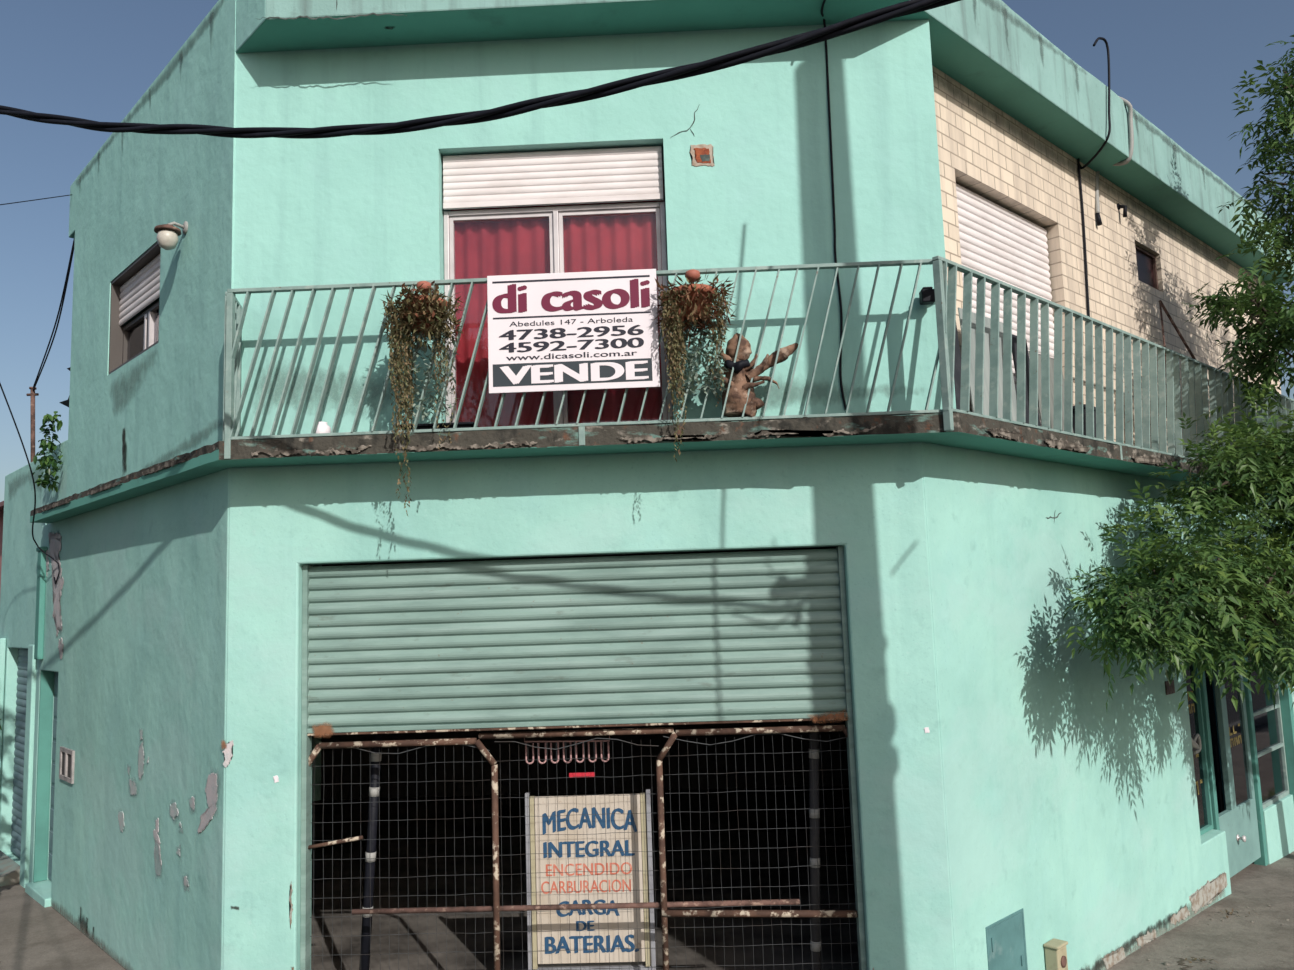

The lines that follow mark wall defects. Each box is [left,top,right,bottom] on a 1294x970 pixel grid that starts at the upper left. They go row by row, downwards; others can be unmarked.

crack [259,0,405,20]
spalling [617,434,723,443]
spalling [747,426,876,438]
spalling [986,427,1022,441]
spalling [250,445,371,457]
spalling [399,441,537,452]
spalling [1045,439,1091,452]
spalling [1131,454,1167,466]
peeling [46,532,64,659]
peeling [153,740,234,876]
flaking render [1189,872,1228,914]